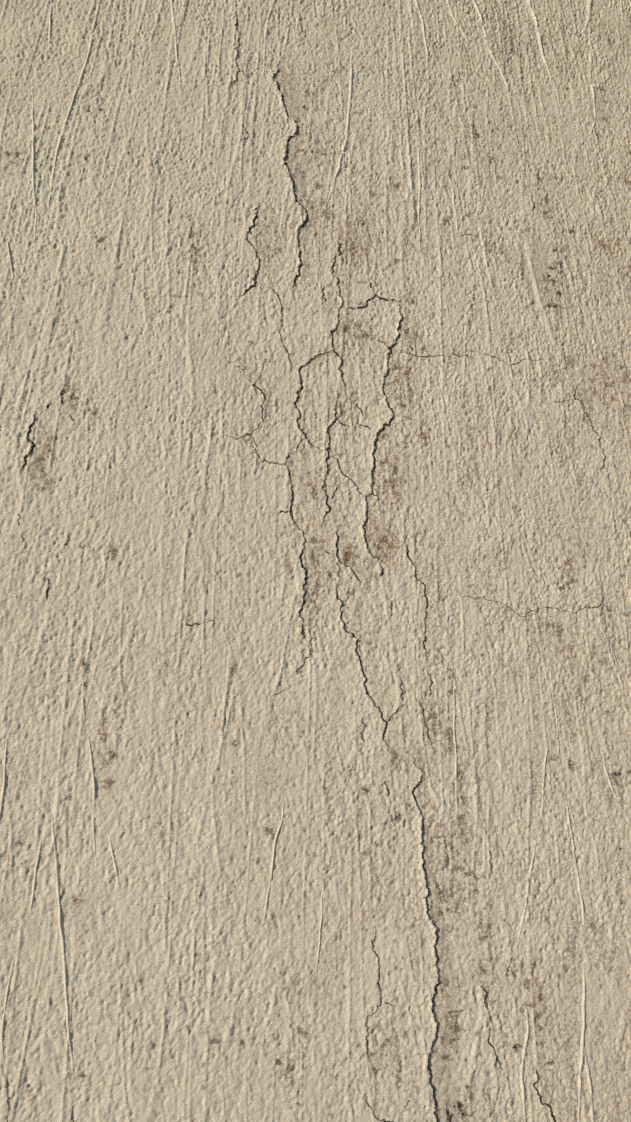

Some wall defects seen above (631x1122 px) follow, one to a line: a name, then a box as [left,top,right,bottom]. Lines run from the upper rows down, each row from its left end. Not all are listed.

crack [224,17,631,1122]